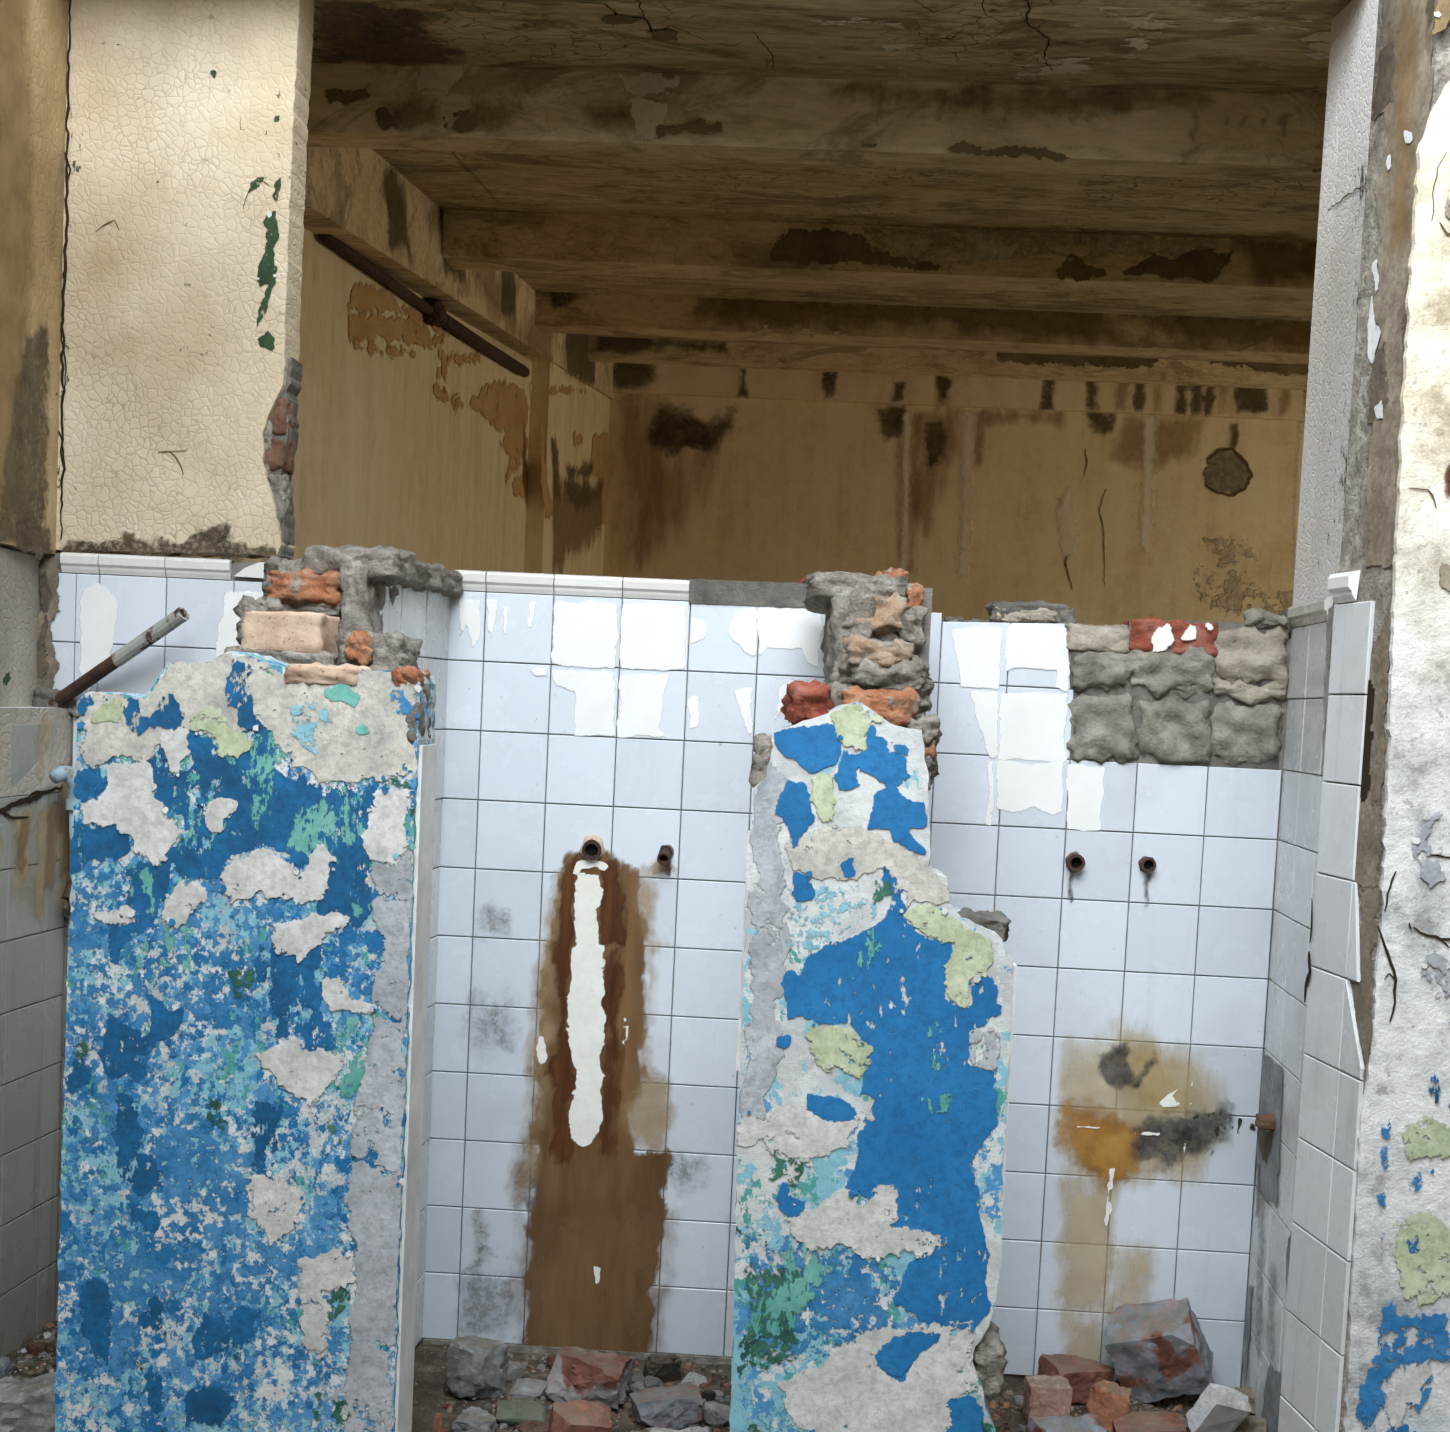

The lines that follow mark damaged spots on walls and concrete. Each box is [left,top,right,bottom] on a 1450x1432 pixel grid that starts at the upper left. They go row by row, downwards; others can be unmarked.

crack [58,0,119,540]
leakage [552,437,602,574]
leakage [613,363,732,474]
leakage [697,298,1312,347]
crack [1328,182,1366,210]
spalling [1363,0,1450,568]
peeling [1065,536,1293,769]
crack [0,786,63,820]
spalling [1347,596,1392,1077]
peeling [76,653,422,1432]
corrosion [521,851,672,1353]
leakage [1160,1082,1193,1108]